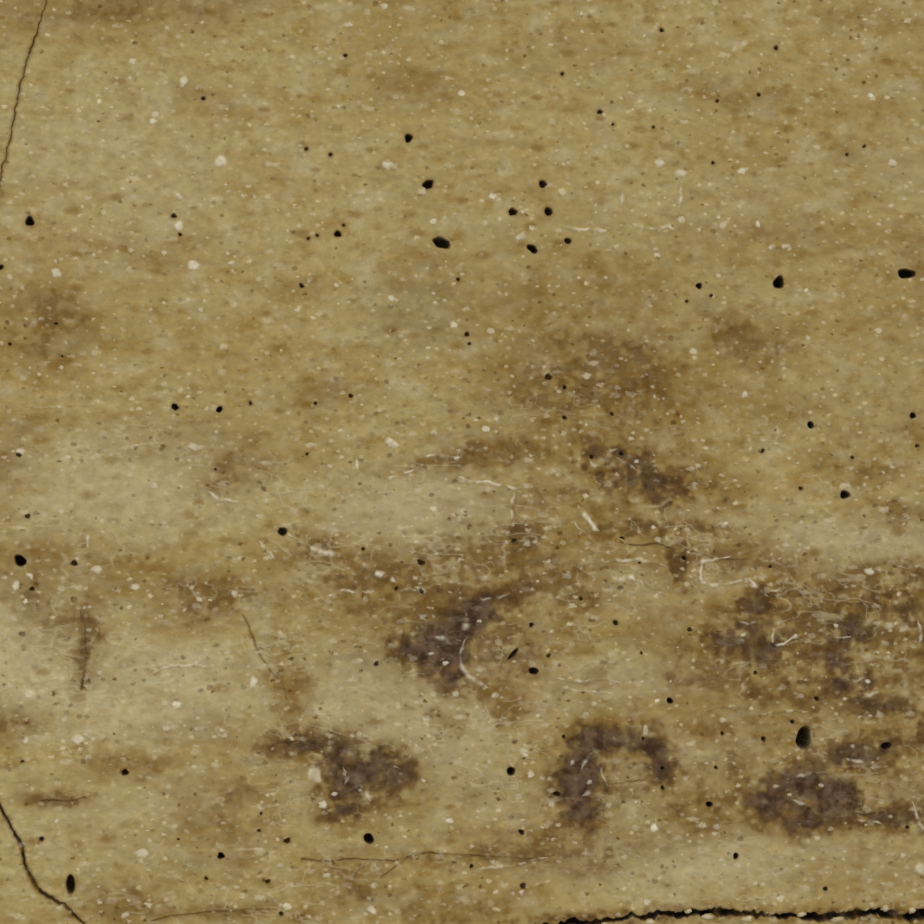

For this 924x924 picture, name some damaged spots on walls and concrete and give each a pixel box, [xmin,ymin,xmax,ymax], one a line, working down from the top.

crack [0,0,49,202]
crack [0,793,88,924]
crack [530,904,924,924]